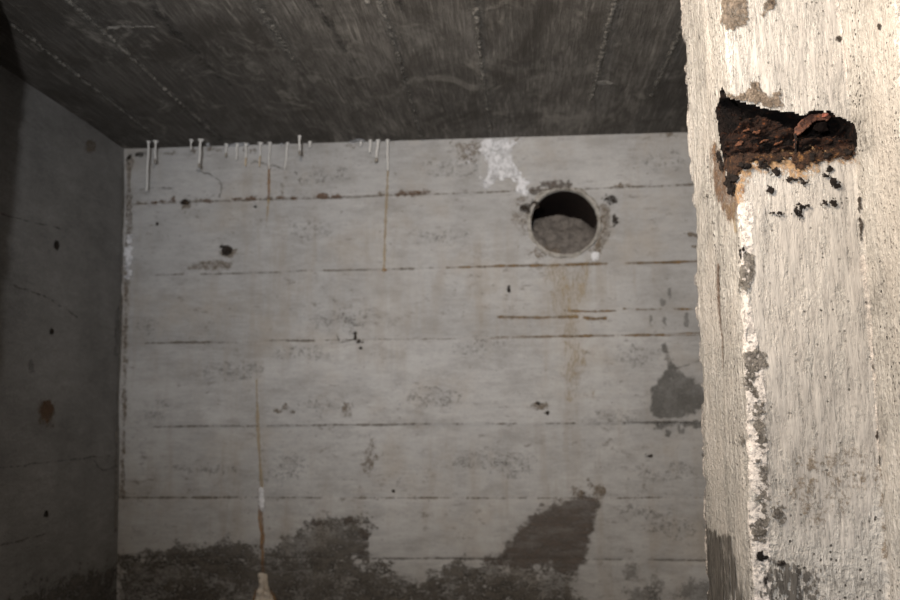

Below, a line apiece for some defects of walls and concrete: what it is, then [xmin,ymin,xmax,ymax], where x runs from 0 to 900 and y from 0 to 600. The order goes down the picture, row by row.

peeling [720,0,749,75]
peeling [761,0,776,17]
peeling [835,0,849,99]
corrosion [378,171,429,272]
damp [453,138,531,196]
corrosion [706,141,855,231]
spalling [715,81,857,600]
peeling [859,255,877,391]
damp [651,363,704,437]
corrosion [252,405,276,600]
damp [8,479,606,600]